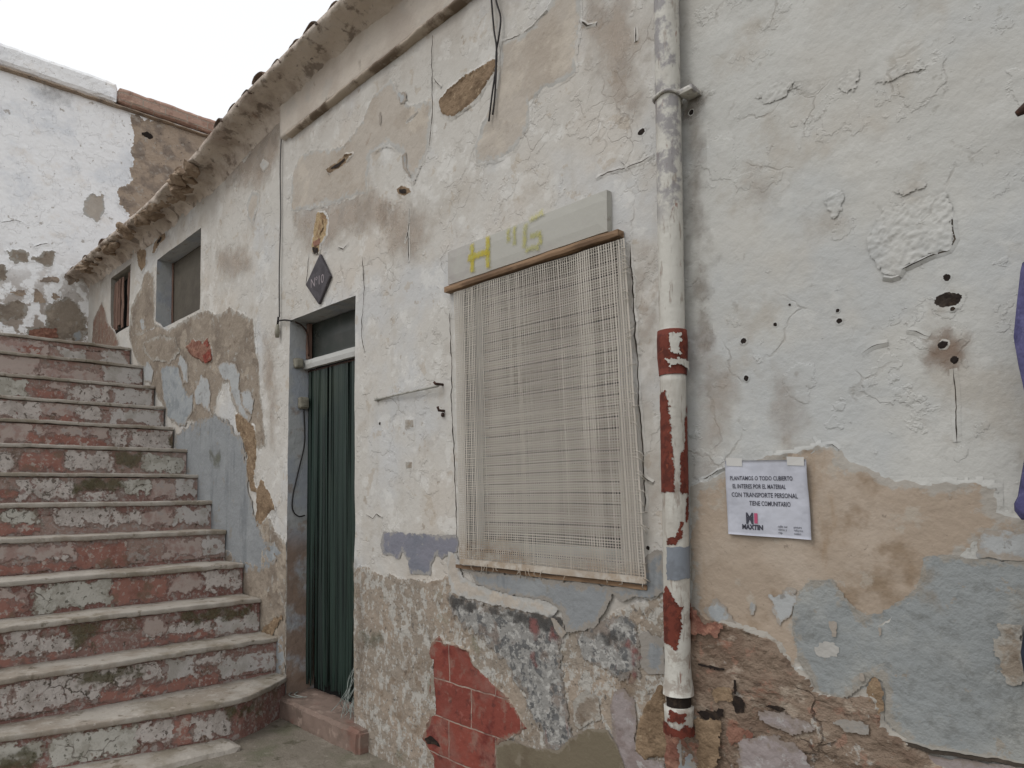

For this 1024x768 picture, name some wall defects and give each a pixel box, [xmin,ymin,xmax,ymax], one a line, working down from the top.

peeling [290,0,583,256]
crack [596,152,654,181]
peeling [0,112,287,720]
peeling [665,332,689,370]
crack [949,368,962,442]
peeling [354,440,1024,768]